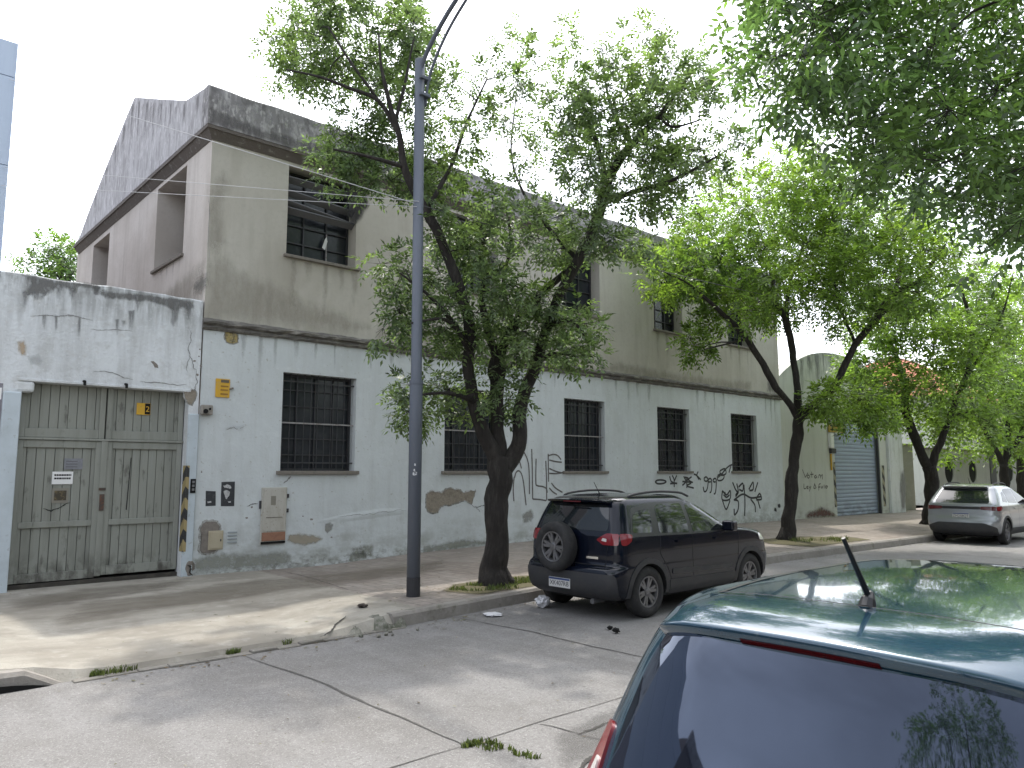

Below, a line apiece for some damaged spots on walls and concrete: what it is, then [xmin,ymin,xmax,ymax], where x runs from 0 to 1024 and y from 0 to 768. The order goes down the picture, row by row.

water stain [24,276,193,322]
crack [94,331,198,390]
spalling [223,332,239,345]
spalling [425,487,476,514]